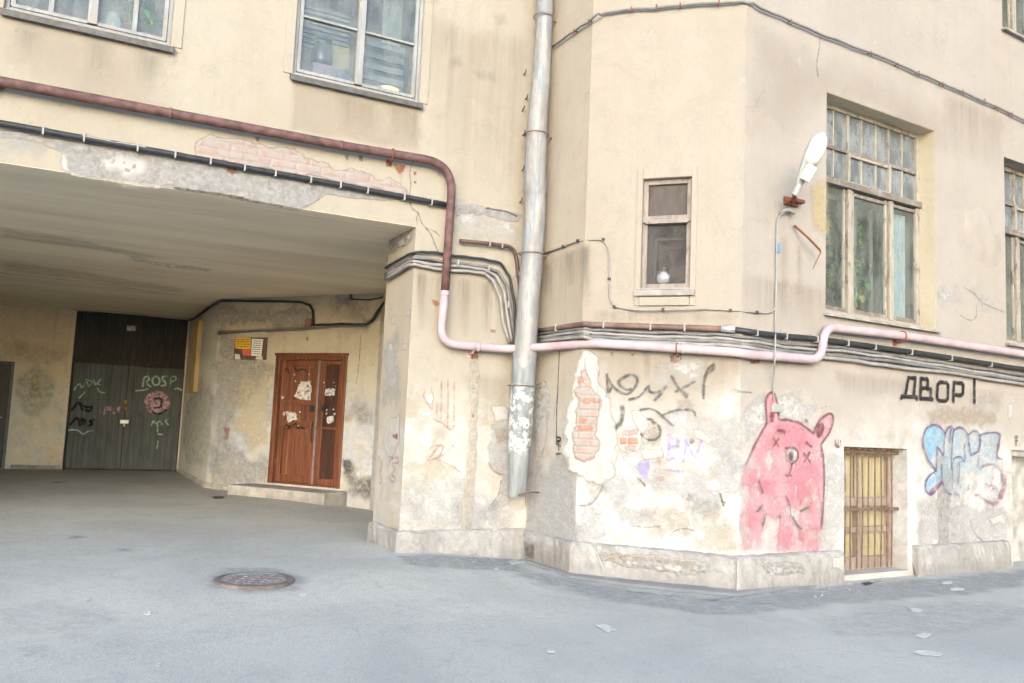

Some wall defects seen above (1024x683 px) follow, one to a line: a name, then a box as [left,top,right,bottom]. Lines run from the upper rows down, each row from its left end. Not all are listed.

spalling [0,131,407,211]
spalling [526,350,652,540]